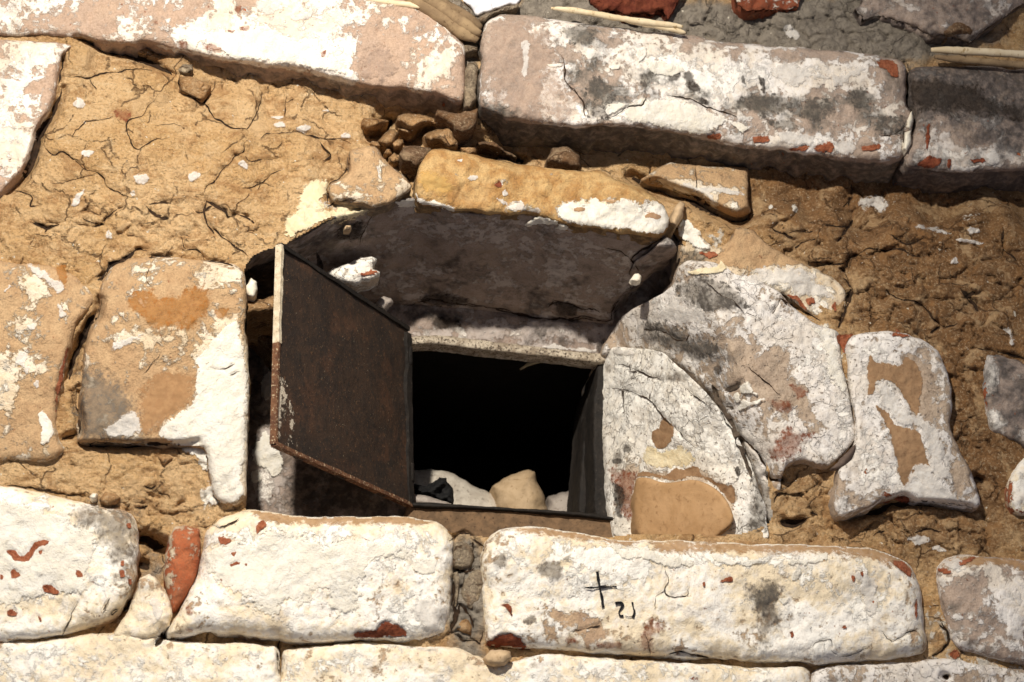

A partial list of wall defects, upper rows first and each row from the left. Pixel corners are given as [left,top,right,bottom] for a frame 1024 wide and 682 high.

crack [62,68,152,89]
crack [558,52,735,118]
crack [14,76,372,285]
crack [702,184,923,328]
crack [1001,227,1016,260]
crack [886,288,978,333]
peeling [104,318,283,506]
corrosion [270,342,281,445]
peeling [651,418,674,449]
crack [612,364,817,503]
peeling [867,355,960,505]
peeling [637,466,735,510]